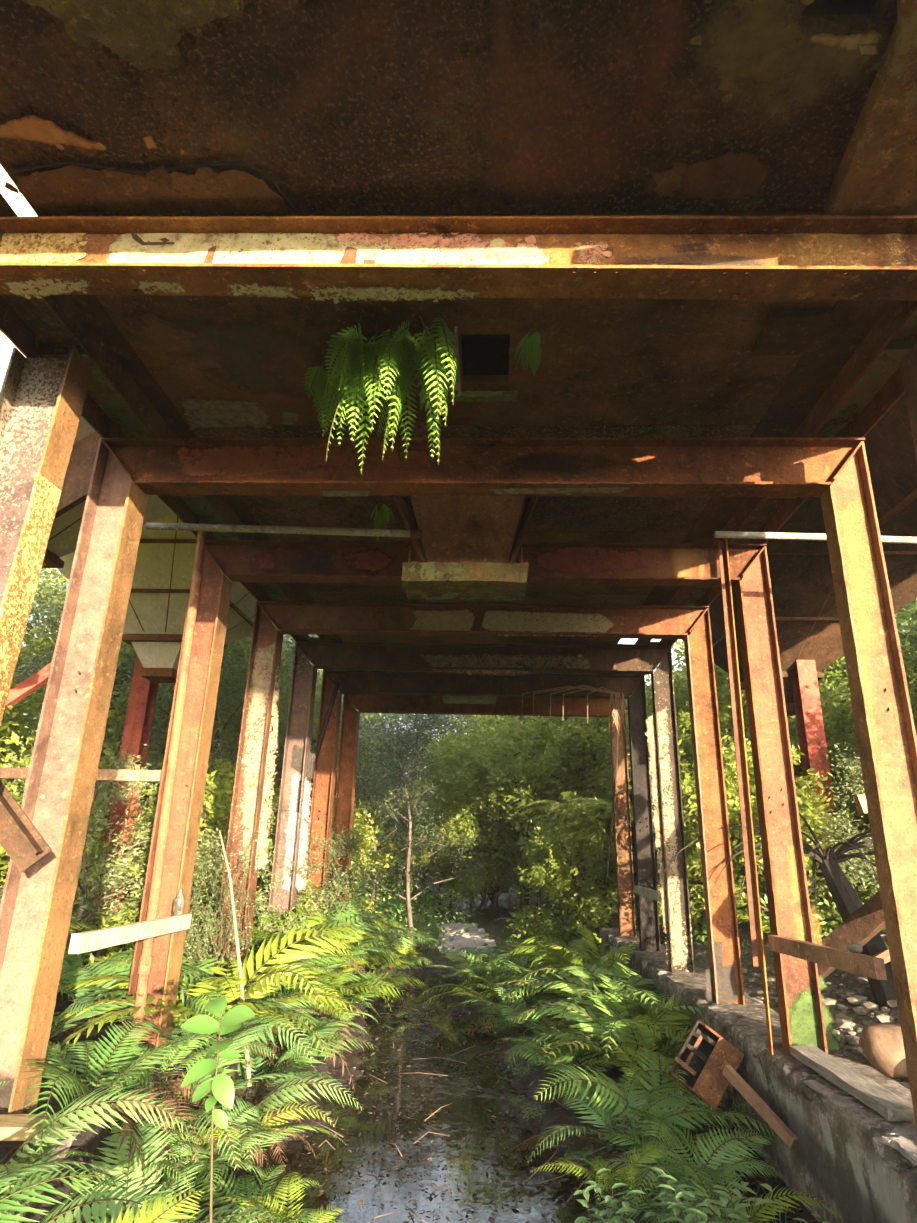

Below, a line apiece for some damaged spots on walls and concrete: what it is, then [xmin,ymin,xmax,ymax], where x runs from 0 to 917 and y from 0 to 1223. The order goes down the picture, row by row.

corrosion [22,0,244,71]
peeling [0,114,106,151]
peeling [142,135,158,150]
corrosion [5,164,290,215]
peeling [0,232,87,263]
peeling [106,232,555,265]
peeling [574,238,612,265]
peeling [4,277,92,299]
peeling [134,279,187,296]
peeling [226,280,482,304]